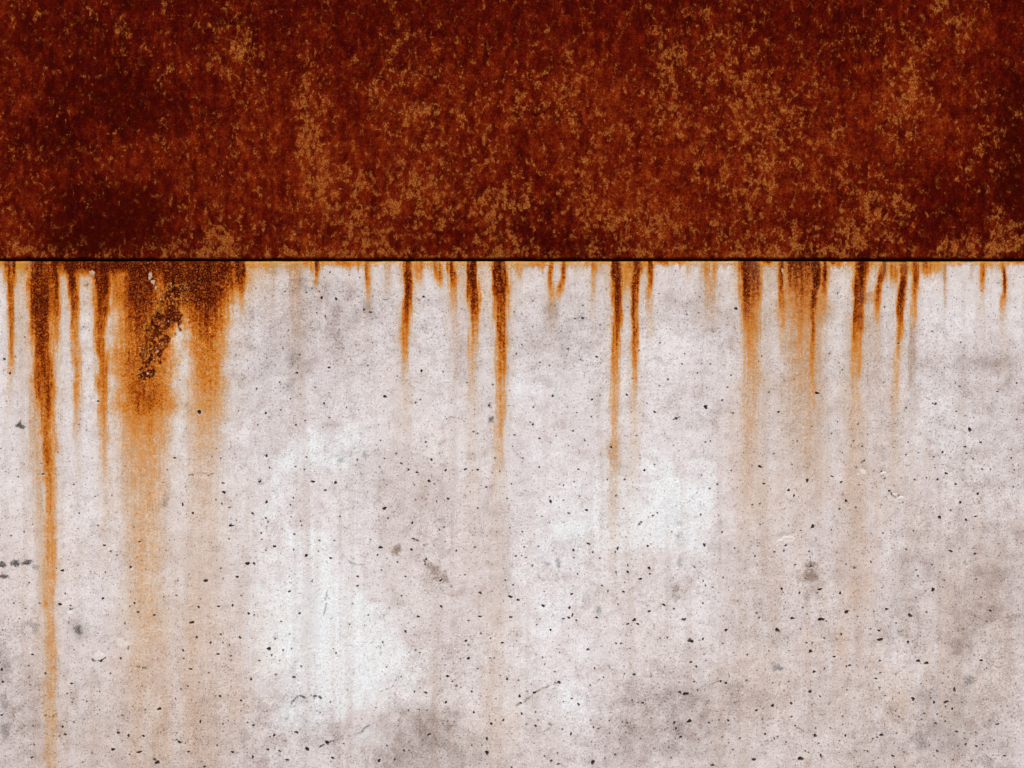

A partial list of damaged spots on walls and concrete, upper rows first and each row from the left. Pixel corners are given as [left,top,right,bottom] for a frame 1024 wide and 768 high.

corrosion [0,261,1024,722]